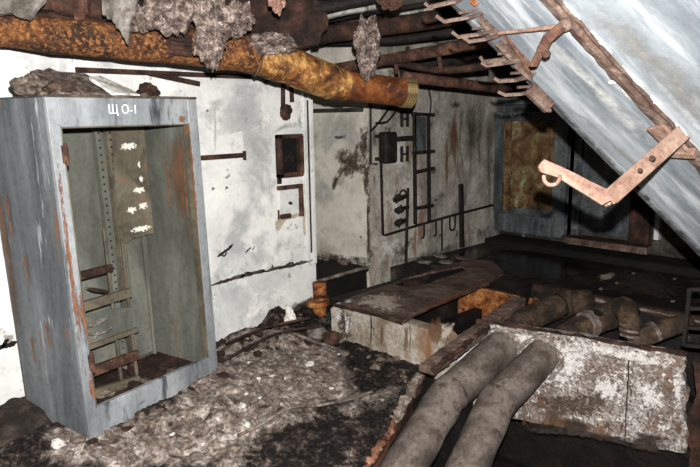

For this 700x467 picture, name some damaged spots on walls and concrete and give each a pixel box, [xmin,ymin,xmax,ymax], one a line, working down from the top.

corrosion [446,121,457,183]
leakage [318,121,371,266]
crack [211,259,313,286]
leakage [547,340,683,419]
leakage [531,421,666,452]